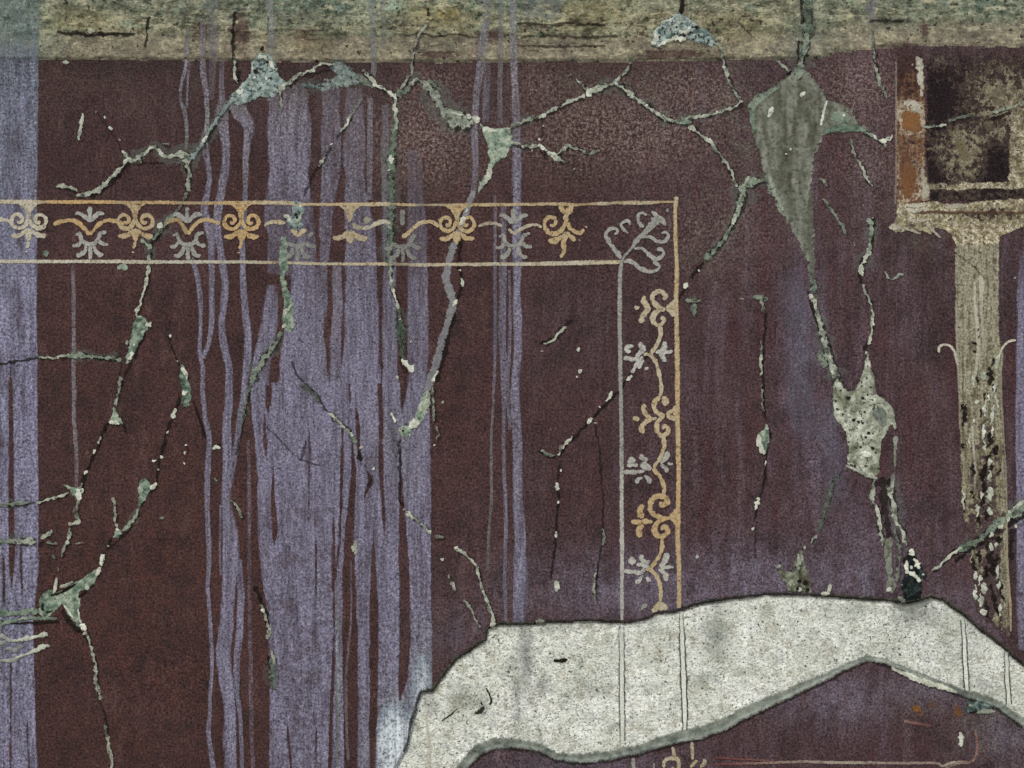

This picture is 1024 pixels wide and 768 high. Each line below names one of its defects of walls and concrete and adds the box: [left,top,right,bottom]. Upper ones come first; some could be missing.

damp [0,0,40,768]
crack [0,344,140,571]
crack [56,12,238,316]
damp [179,29,432,768]
crack [250,332,496,628]
crack [276,8,480,446]
damp [471,0,526,623]
crack [511,22,771,311]
flaking render [651,0,717,47]
flaking render [397,354,1024,768]
flaking render [748,67,869,281]
crack [818,131,893,355]